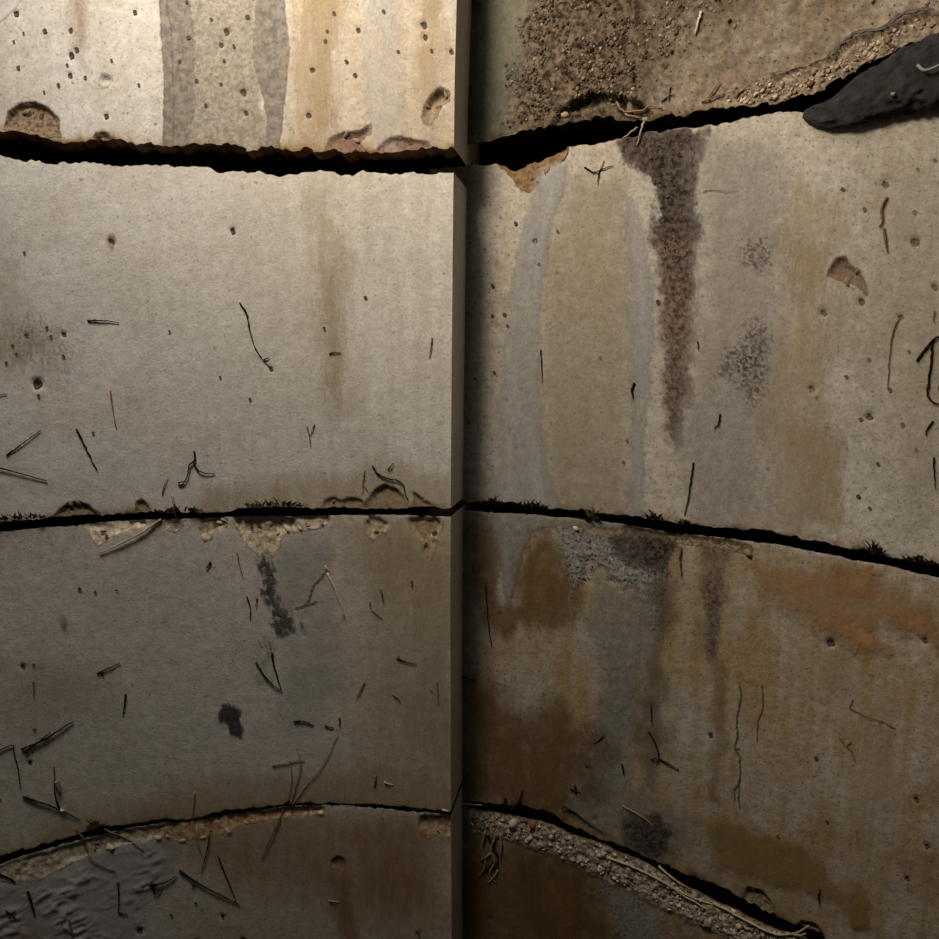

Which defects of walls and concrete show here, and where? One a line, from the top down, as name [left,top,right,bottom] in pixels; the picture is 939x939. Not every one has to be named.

spalling [713,7,939,109]
crack [774,2,934,76]
spalling [550,95,653,126]
water stain [473,124,776,631]
spalling [198,484,444,563]
water stain [255,554,305,655]
water stain [220,707,243,737]
spalling [465,806,826,939]
water stain [621,812,677,859]